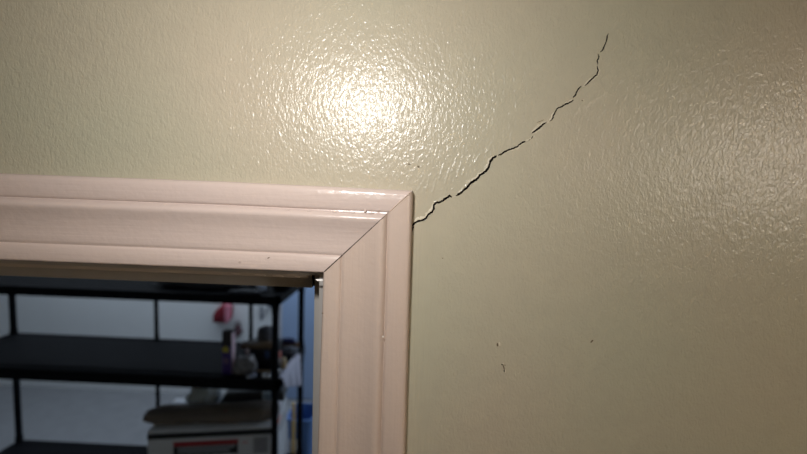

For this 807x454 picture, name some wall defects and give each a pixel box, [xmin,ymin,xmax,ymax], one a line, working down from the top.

crack [412,33,609,231]
crack [324,192,411,272]